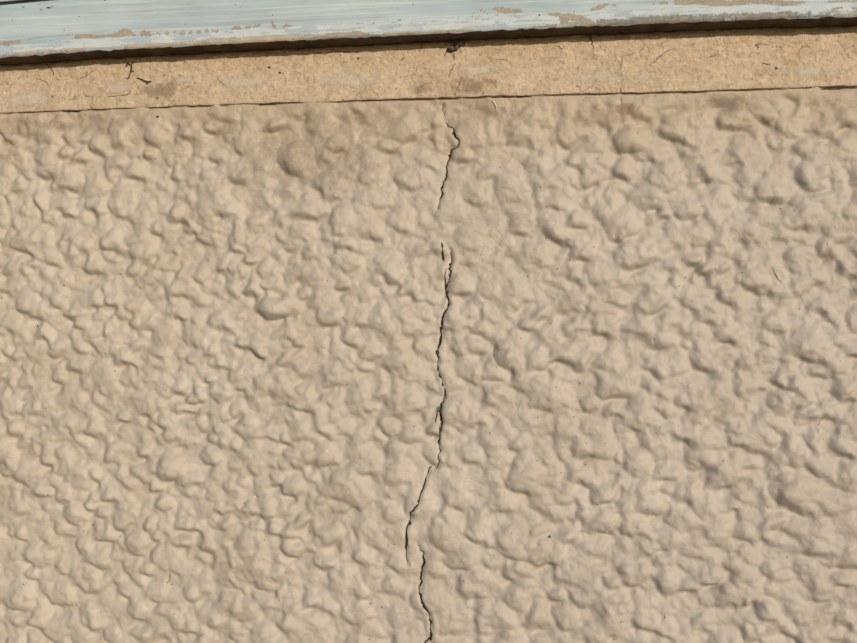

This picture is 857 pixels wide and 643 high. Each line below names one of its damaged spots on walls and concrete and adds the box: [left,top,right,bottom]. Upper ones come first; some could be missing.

peeling [471,6,523,20]
peeling [533,3,616,27]
peeling [0,28,219,46]
peeling [310,31,385,40]
crack [405,242,453,643]